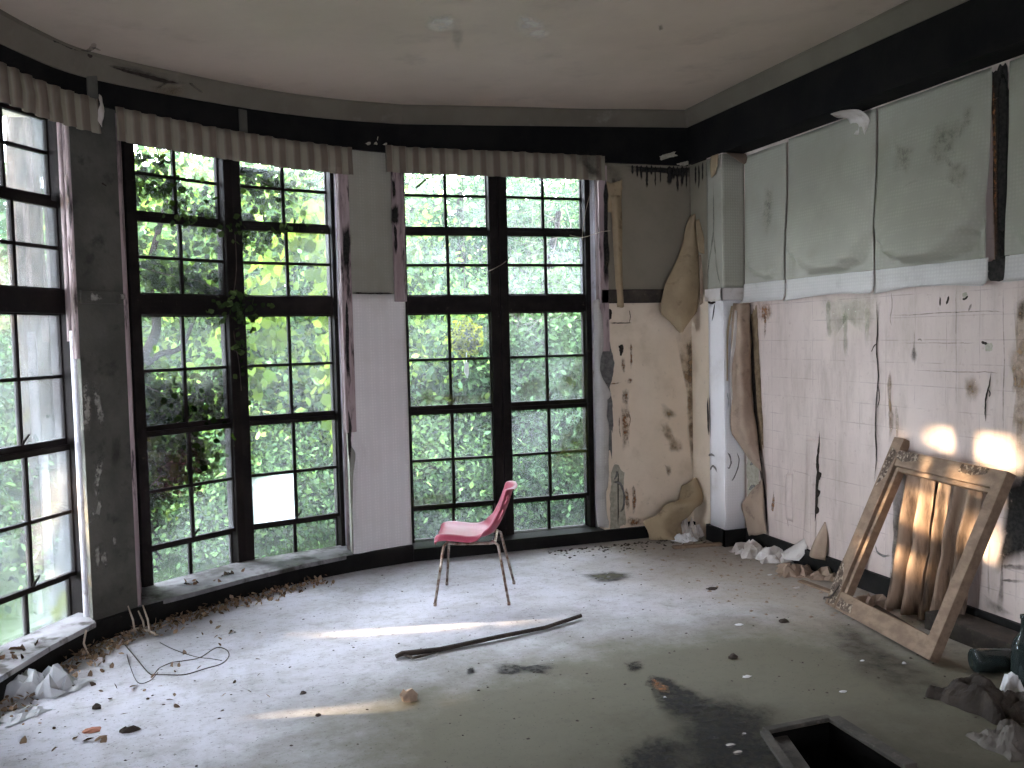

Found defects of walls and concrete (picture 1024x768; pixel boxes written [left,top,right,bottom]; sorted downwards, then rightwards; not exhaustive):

damp [631,163,707,190]
damp [681,346,693,410]
crack [871,302,880,471]
crack [983,375,991,421]